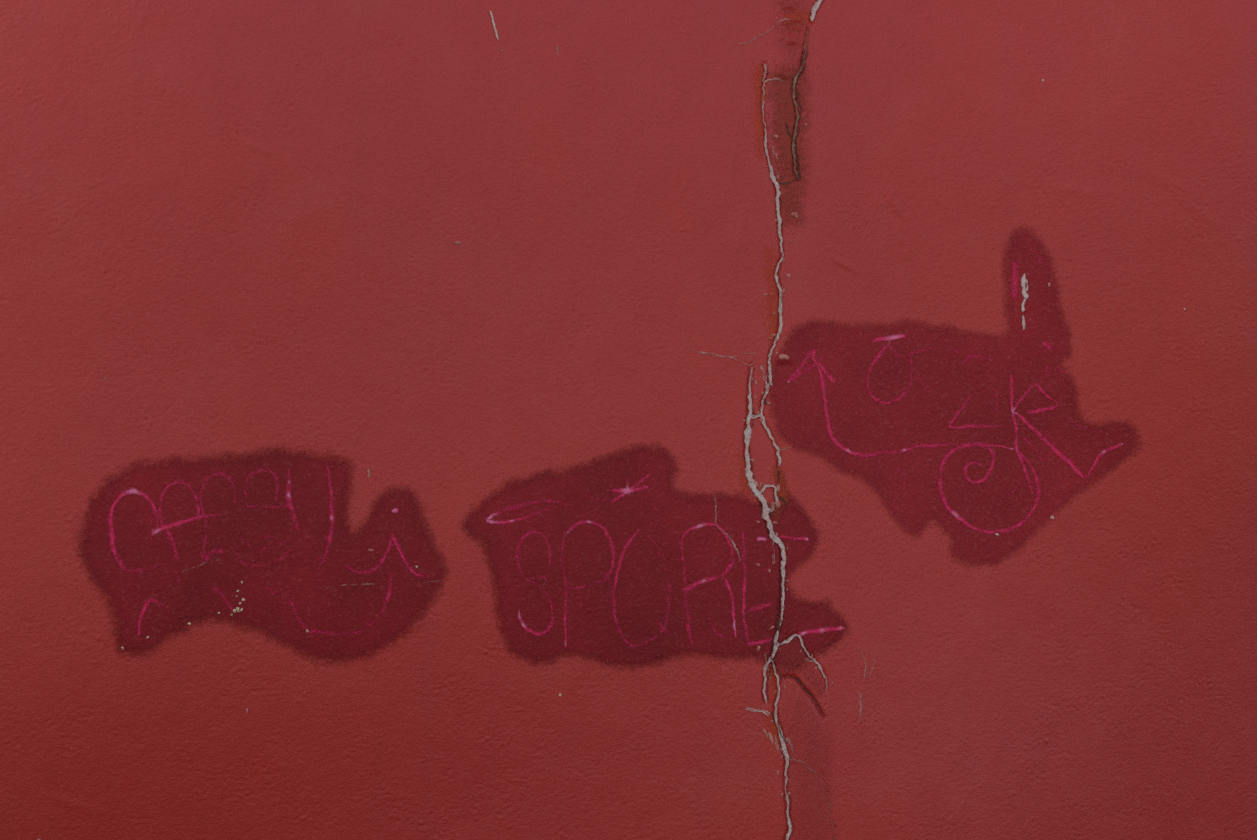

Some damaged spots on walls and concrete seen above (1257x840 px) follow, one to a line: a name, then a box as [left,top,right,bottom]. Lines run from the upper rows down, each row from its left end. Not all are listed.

crack [700,0,874,840]